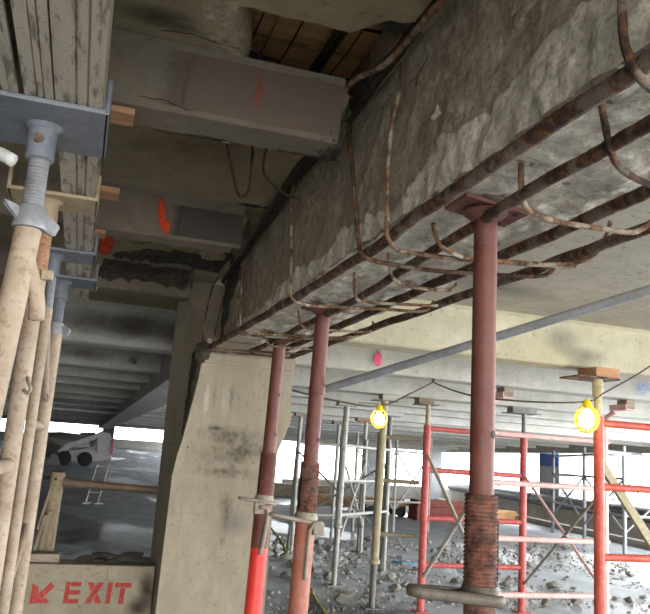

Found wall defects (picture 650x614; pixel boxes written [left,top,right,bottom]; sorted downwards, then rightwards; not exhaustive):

crack [138,96,194,111]
spalling [98,0,650,347]